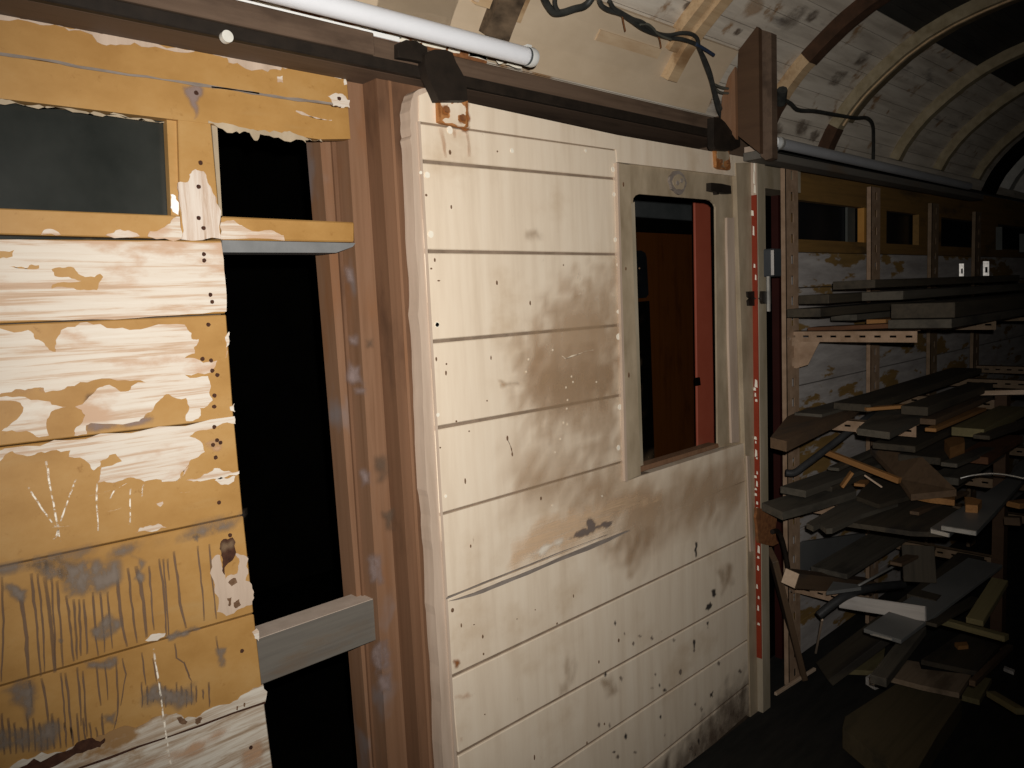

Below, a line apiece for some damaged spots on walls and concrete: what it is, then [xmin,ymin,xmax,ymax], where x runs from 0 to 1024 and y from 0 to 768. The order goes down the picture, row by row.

peeling [0,15,194,53]
peeling [352,25,522,69]
peeling [216,55,287,83]
peeling [0,99,164,123]
peeling [328,77,350,108]
peeling [208,121,322,143]
peeling [0,169,285,485]
peeling [210,537,254,616]
crack [446,530,630,601]